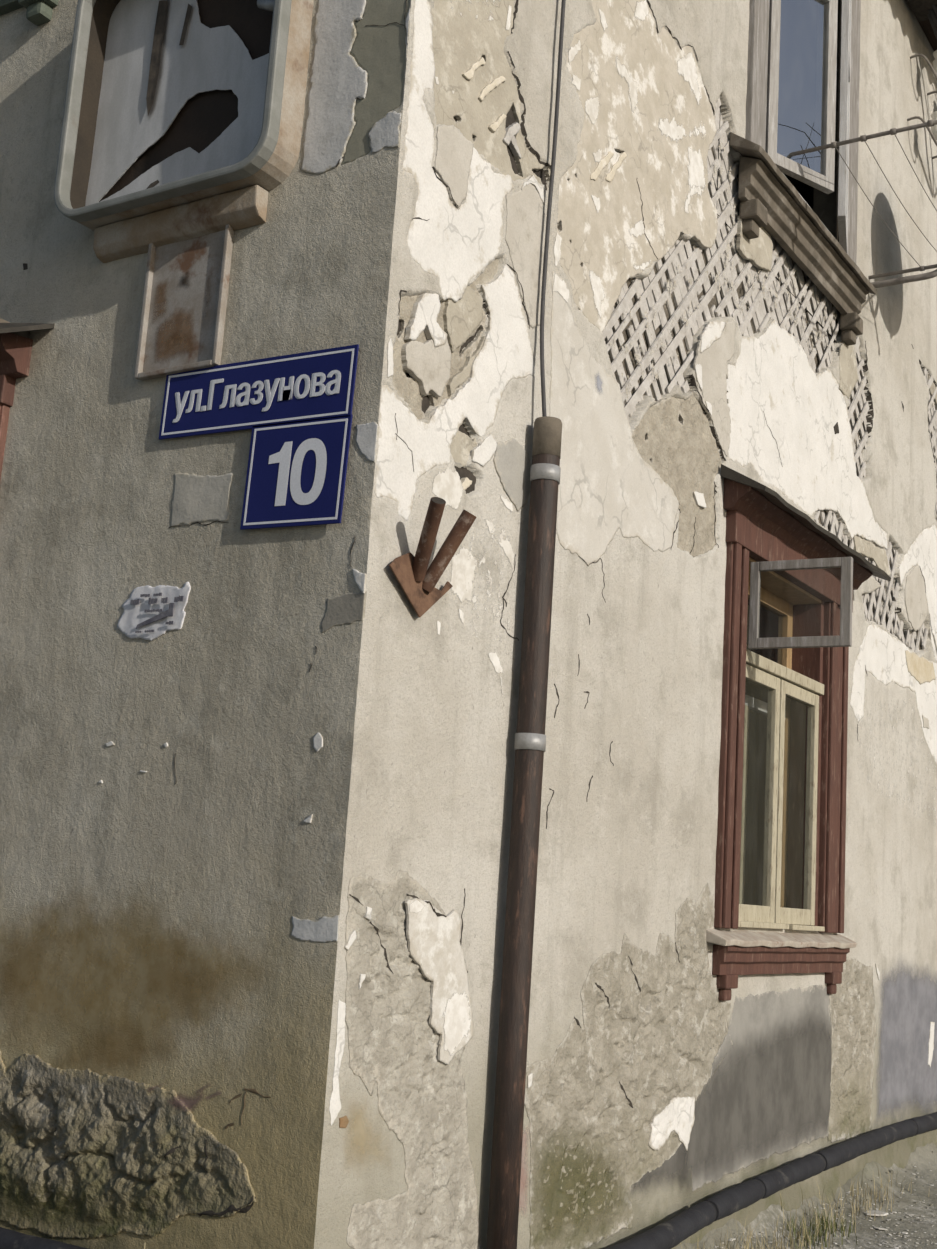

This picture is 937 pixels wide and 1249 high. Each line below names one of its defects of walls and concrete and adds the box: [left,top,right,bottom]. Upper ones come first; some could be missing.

peeling [300,0,888,603]
peeling [313,732,323,752]
peeling [450,519,514,697]
peeling [850,524,937,818]
flaking render [0,1050,257,1239]
flaking render [329,870,482,1249]
flaking render [524,883,733,1249]
flaking render [827,956,877,1143]